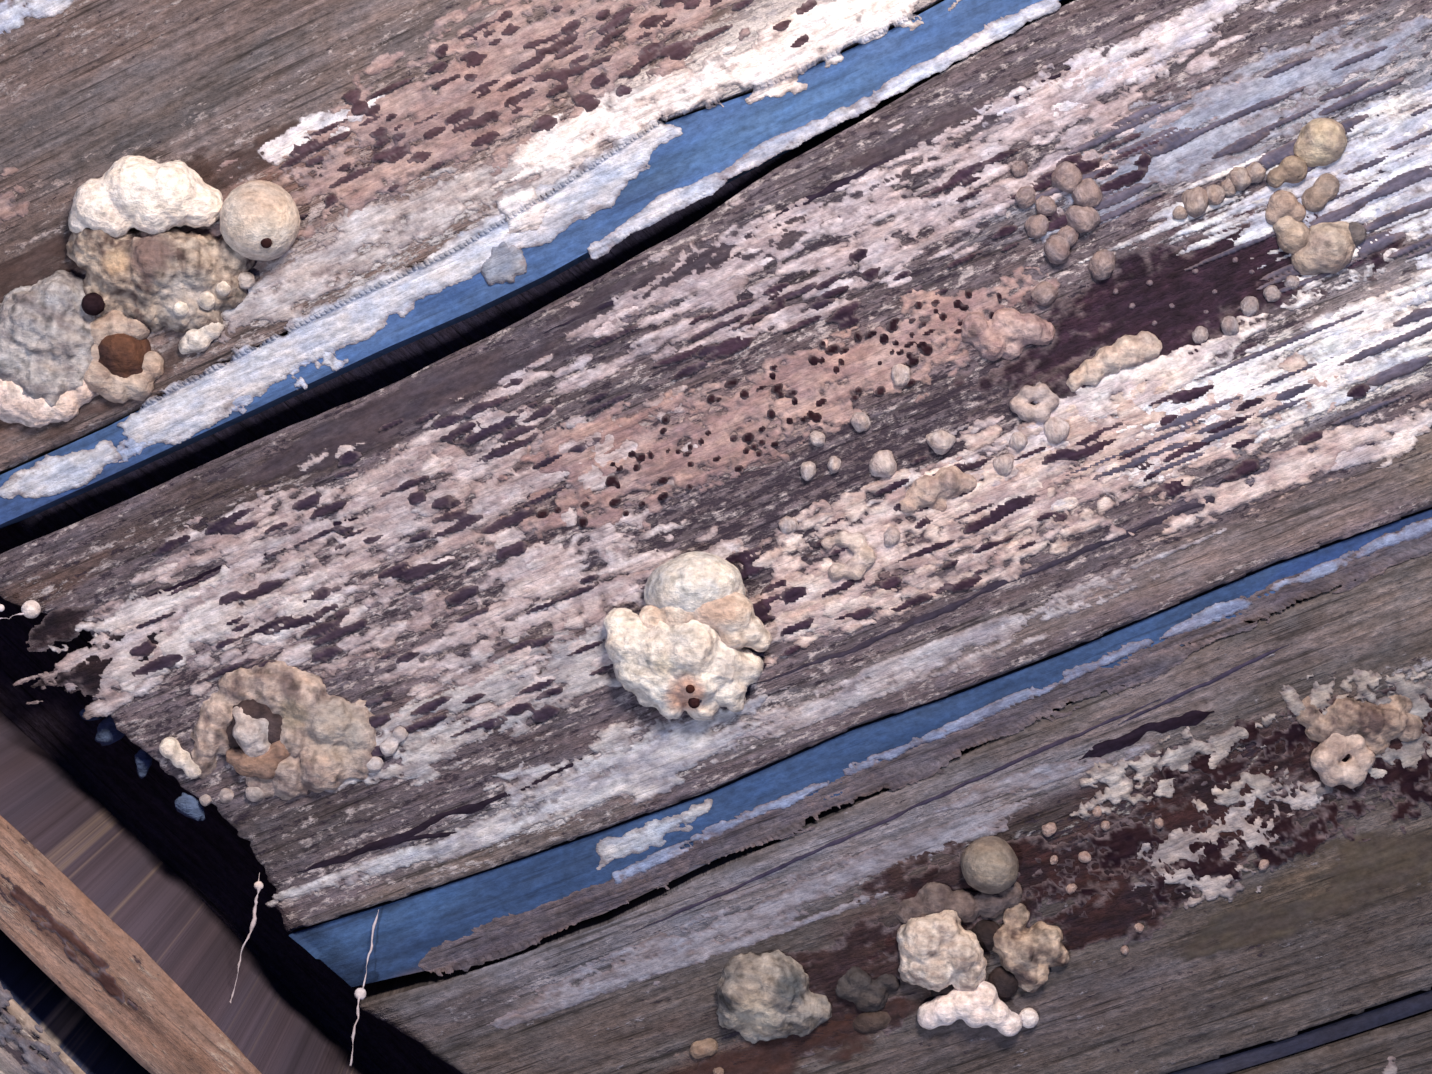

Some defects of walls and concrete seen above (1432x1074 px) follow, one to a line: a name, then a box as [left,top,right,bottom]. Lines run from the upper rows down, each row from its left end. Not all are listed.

peeling [0,0,1432,793]
spalling [6,877,138,1010]
peeling [265,517,1432,976]
peeling [487,709,1312,1030]